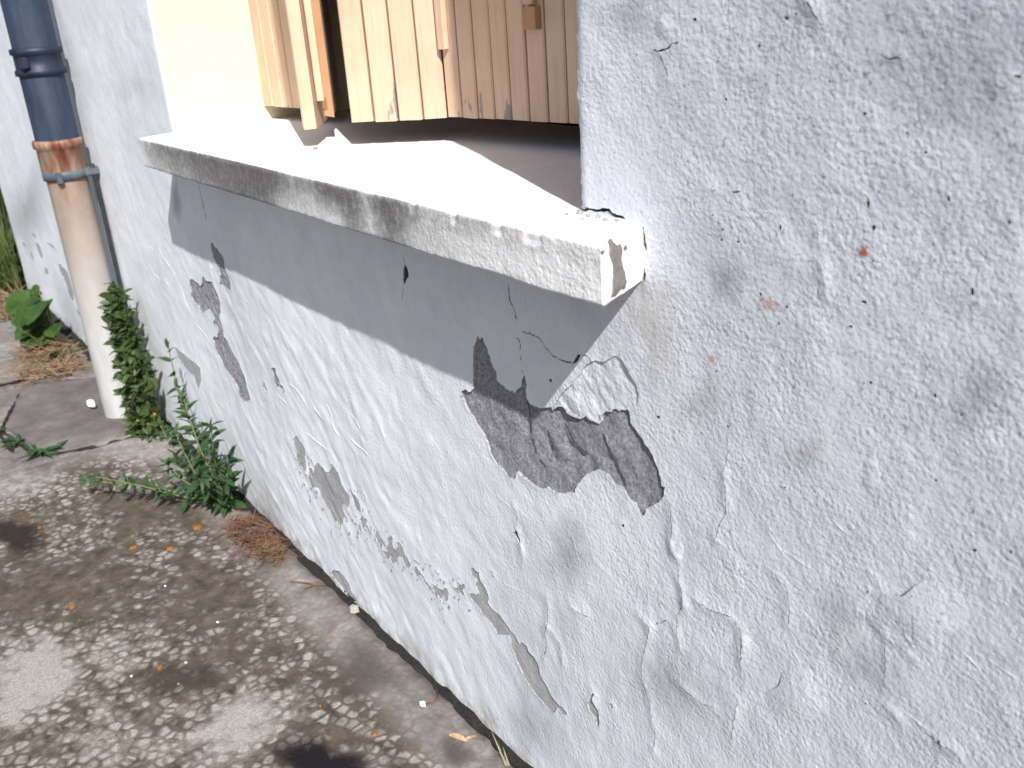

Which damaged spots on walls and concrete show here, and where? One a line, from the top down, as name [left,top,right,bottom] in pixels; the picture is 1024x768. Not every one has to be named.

spalling [150,242,250,402]
crack [508,284,591,372]
spalling [601,239,628,298]
spalling [461,337,665,516]
spalling [293,436,567,715]